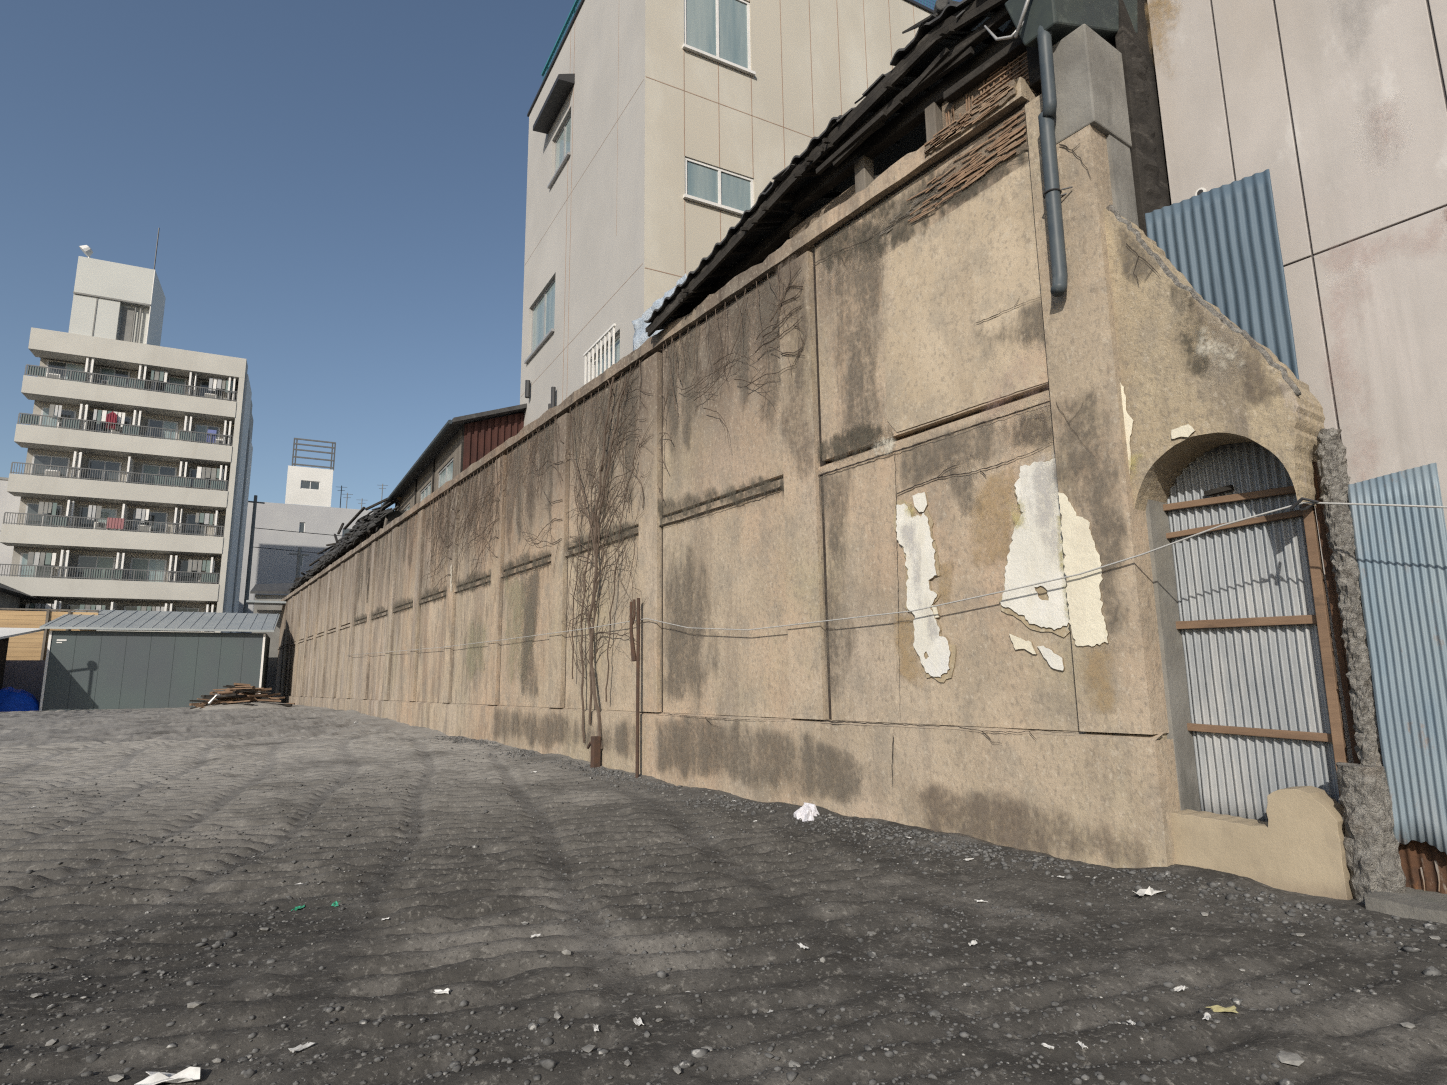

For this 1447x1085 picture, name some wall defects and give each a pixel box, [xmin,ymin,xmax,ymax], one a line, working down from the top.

water stain [658,151,1024,573]
water stain [665,549,706,696]
flaking render [893,492,957,683]
flaking render [999,457,1109,671]
water stain [658,716,860,800]
corrosion [1398,840,1447,894]